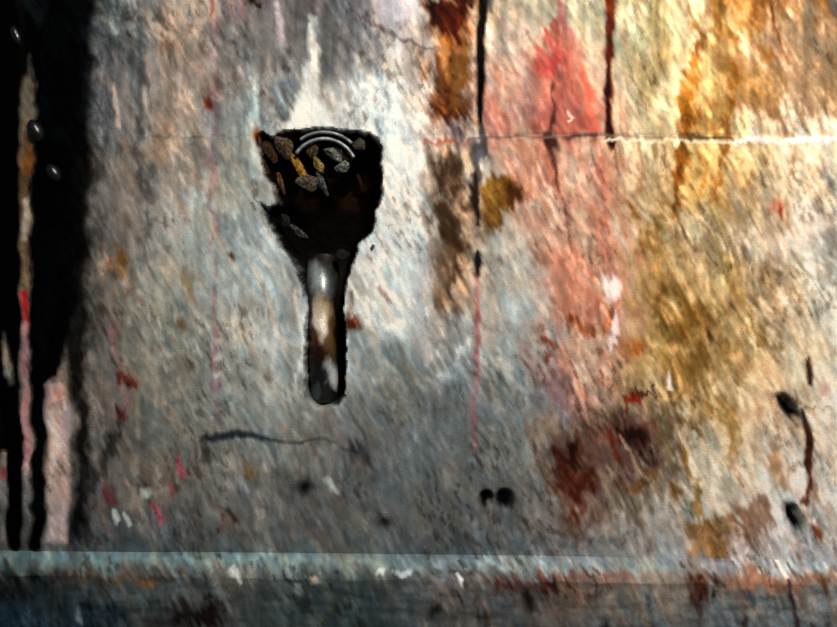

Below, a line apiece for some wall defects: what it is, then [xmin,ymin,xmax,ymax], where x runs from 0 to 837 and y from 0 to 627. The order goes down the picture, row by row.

rust [248,121,263,147]
crack [440,116,734,147]
rust [411,0,537,339]
leakage [0,0,224,552]
rust [375,282,396,307]
rust [343,288,369,336]
rust [469,0,837,627]
leakage [250,224,305,446]
leakage [226,562,243,587]
leakage [374,564,417,579]
leakage [453,571,464,588]
rust [424,596,449,626]